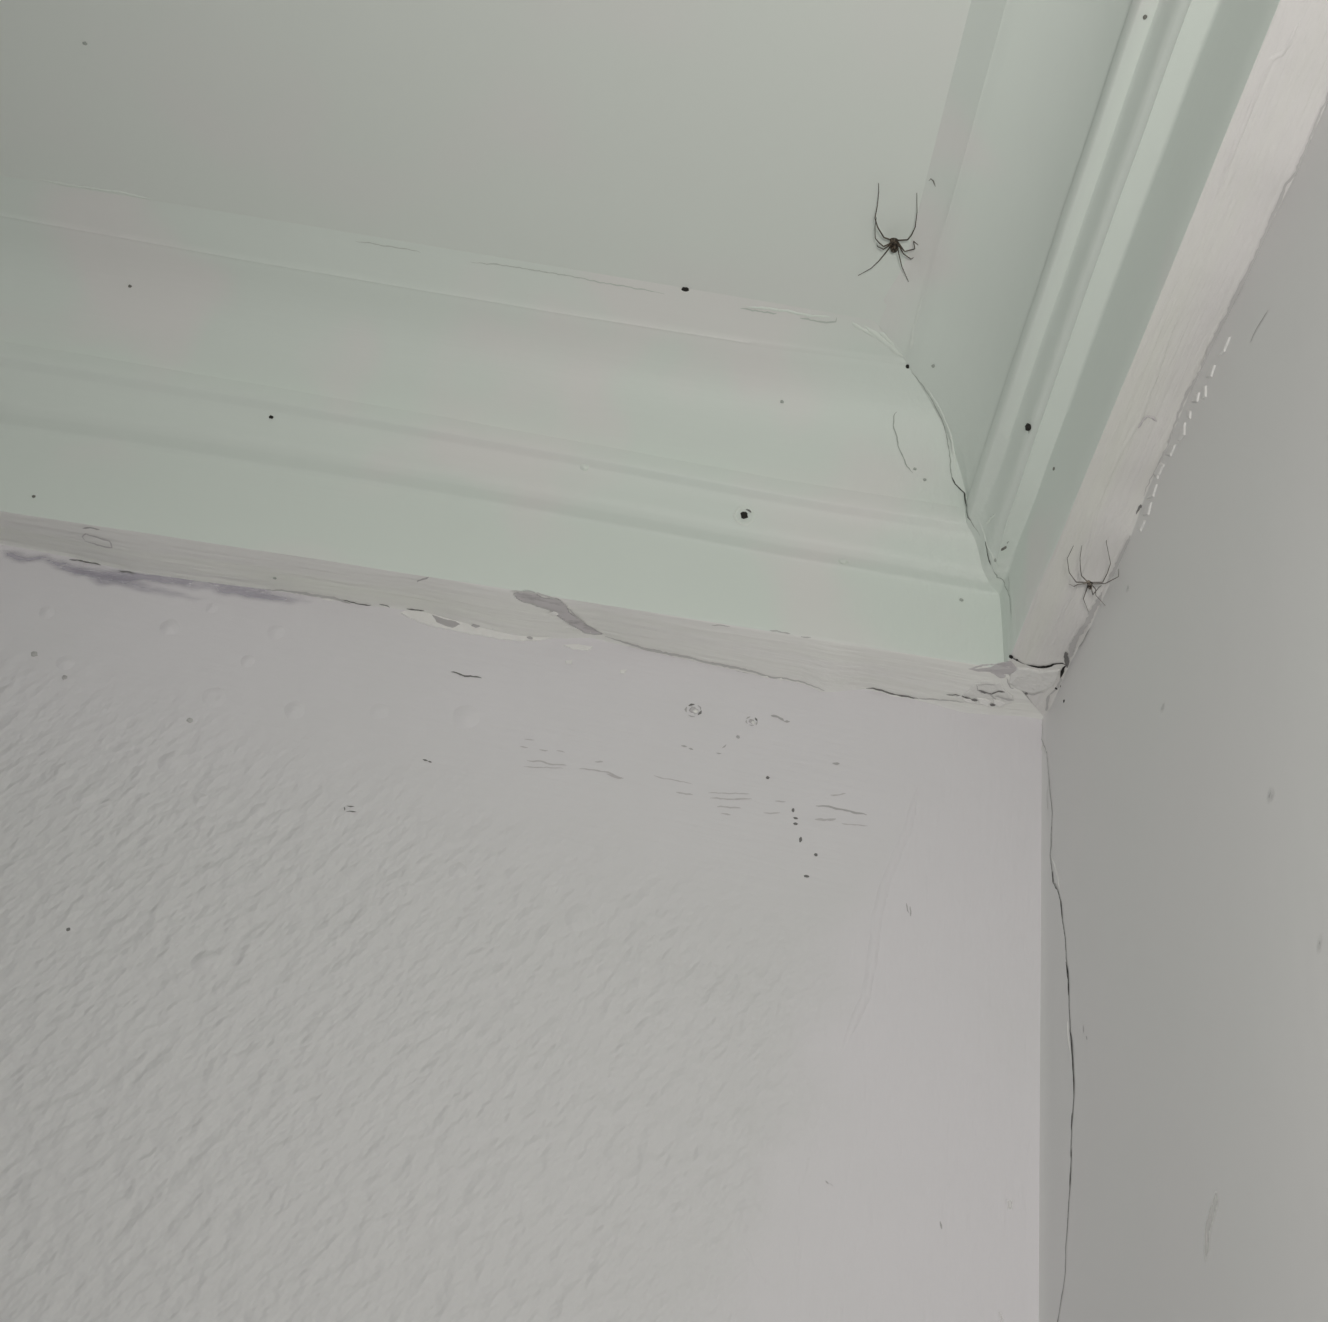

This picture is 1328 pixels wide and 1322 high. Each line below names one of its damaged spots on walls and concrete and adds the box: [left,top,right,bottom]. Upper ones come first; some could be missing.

crack [893,414,913,473]
crack [912,373,1011,611]
peeling [513,590,602,635]
peeling [956,661,1060,708]
crack [1007,92,1328,1322]